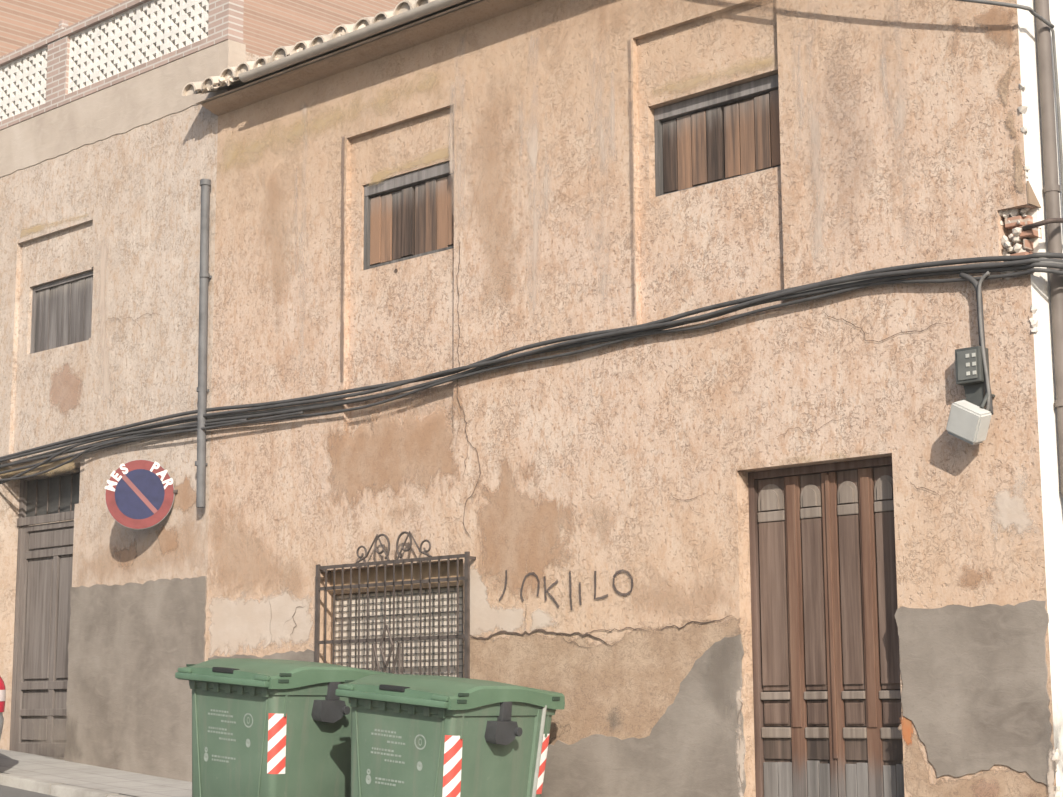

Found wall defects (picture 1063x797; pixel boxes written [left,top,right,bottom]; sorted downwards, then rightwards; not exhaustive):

crack [824,311,954,342]
crack [448,243,491,538]
peeling [328,403,458,509]
peeling [209,590,313,658]
crack [470,603,732,648]
spalling [463,462,741,745]
spalling [736,687,746,797]
spalling [898,724,1061,797]